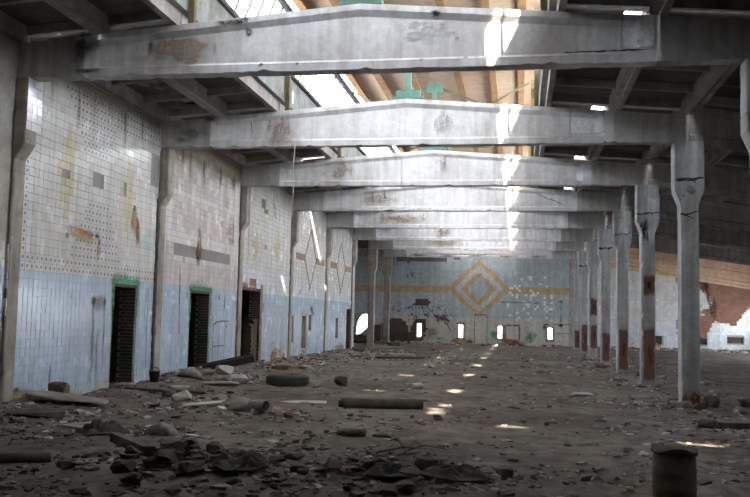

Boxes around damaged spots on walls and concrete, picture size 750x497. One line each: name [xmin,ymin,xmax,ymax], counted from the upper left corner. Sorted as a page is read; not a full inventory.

crack [565,47,646,55]
crack [676,176,704,184]
flaking render [353,298,458,342]
flaking render [699,282,750,339]